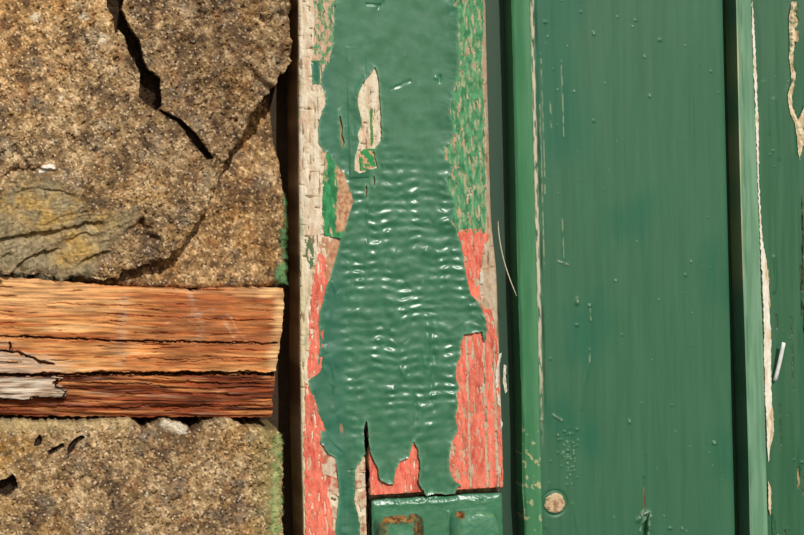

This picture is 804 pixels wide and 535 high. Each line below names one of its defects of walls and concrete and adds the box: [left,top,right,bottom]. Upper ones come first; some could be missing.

spalling [0,94,286,289]
crack [107,0,214,160]
peeling [298,0,354,535]
peeling [355,67,382,173]
peeling [444,0,507,490]
peeling [751,1,786,462]
peeling [788,1,804,157]
spalling [0,474,17,497]
spalling [34,435,85,455]
crack [0,336,277,401]
rust [383,514,423,535]
peeling [768,481,778,535]